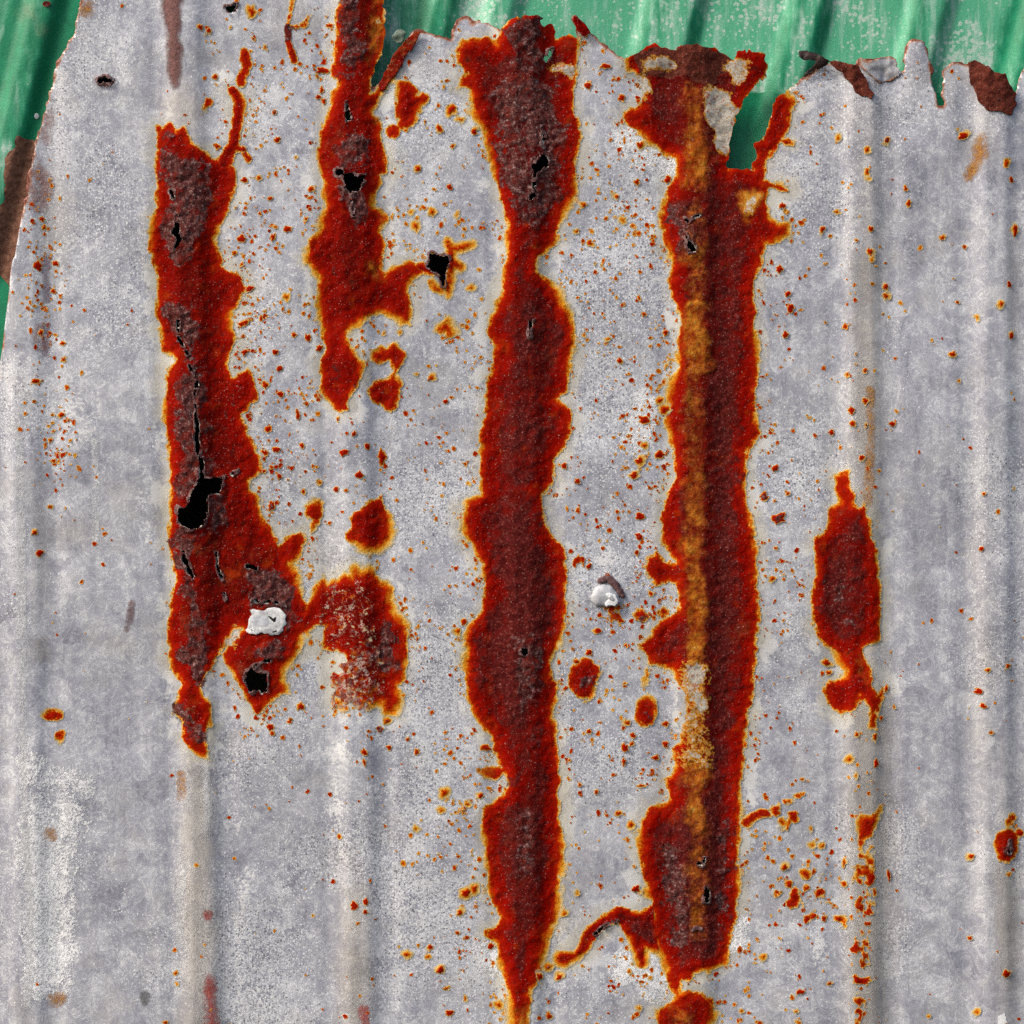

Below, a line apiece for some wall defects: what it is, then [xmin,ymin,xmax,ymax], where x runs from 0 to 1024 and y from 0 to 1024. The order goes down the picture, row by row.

corrosion [146,0,907,1024]
corrosion [993,812,1024,877]